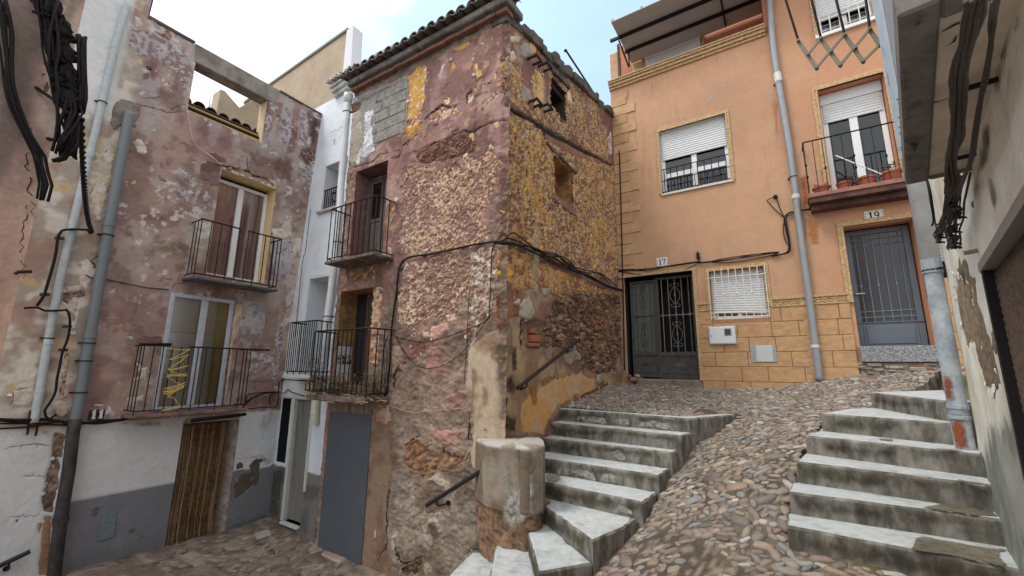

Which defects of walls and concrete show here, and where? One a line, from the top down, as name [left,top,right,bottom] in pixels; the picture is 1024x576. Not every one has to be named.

peeling [132,139,149,154]
peeling [264,98,316,184]
crack [19,130,37,279]
peeling [157,152,276,211]
flaking render [345,32,622,435]
peeling [951,258,1001,398]
rust [944,377,953,398]
flaking render [36,432,65,575]
flaking render [234,458,266,498]
flaking render [404,428,467,482]
rust [952,419,967,449]